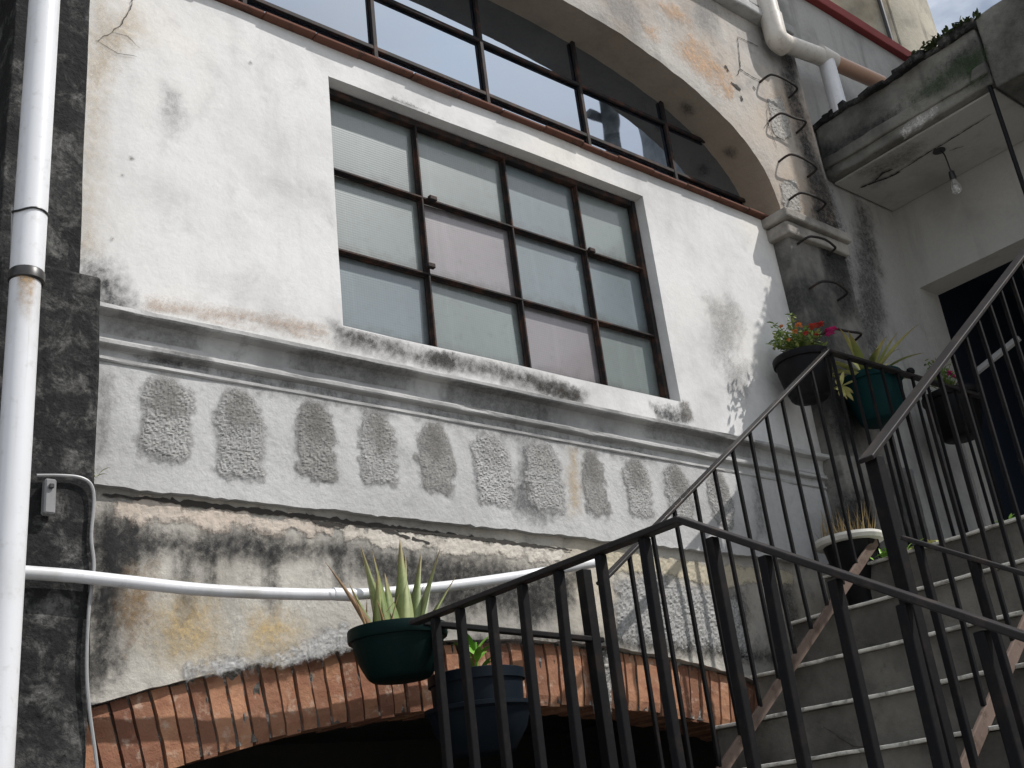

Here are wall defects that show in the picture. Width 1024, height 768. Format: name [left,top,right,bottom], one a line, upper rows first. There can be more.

crack [97,0,137,57]
water stain [782,54,900,228]
water stain [823,206,884,354]
water stain [337,328,580,400]
water stain [94,518,577,620]
peeling [114,495,564,564]
water stain [90,586,116,676]